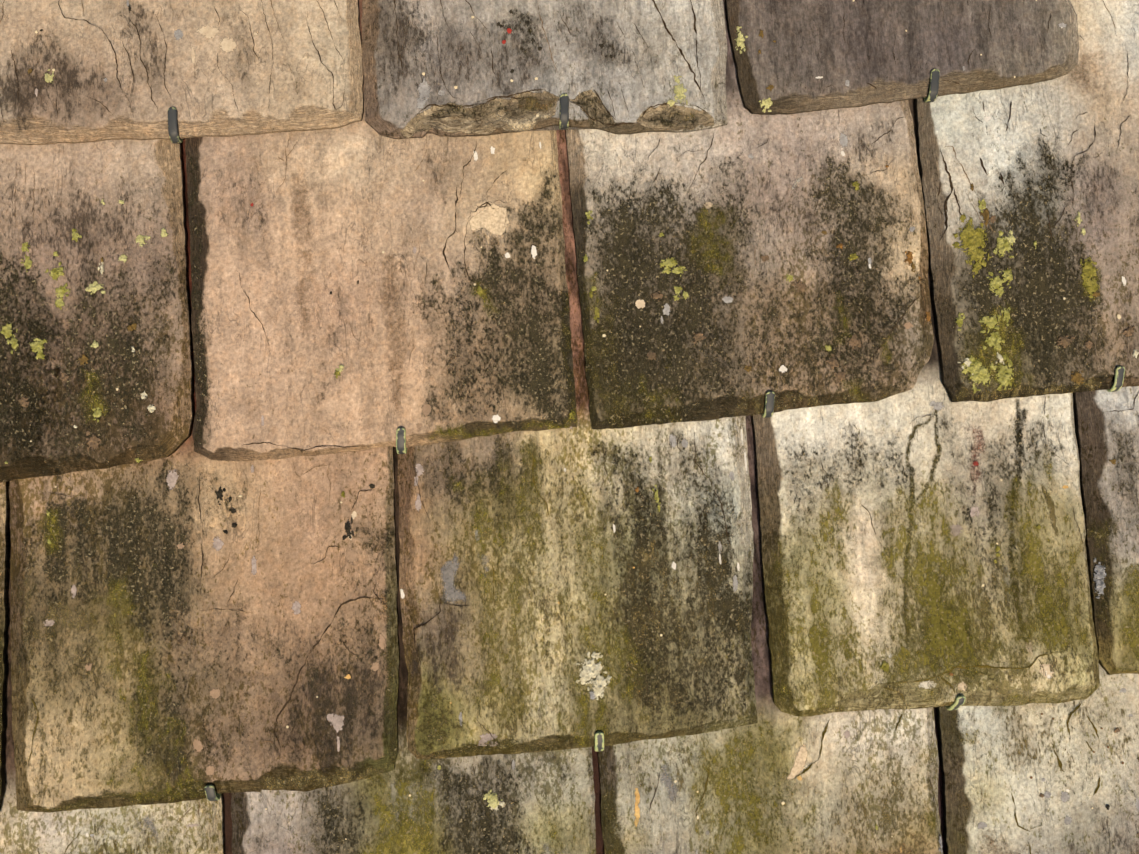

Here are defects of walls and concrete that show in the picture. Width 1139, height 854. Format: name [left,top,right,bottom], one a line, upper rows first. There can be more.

crack [58,1,169,111]
crack [214,0,346,110]
spalling [400,78,615,138]
crack [394,0,714,281]
spalling [637,100,714,131]
leakage [915,412,942,504]